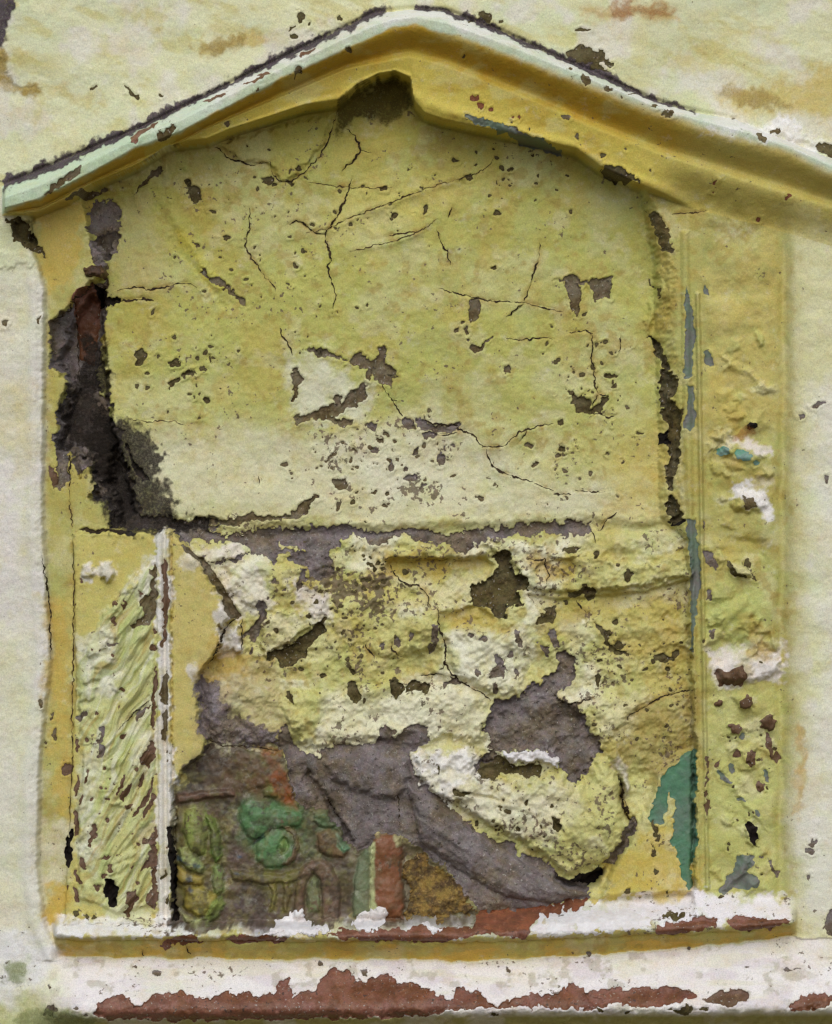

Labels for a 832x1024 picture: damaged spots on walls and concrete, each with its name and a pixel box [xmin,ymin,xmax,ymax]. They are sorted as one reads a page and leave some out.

crack [215,118,613,419]
peeling [37,165,593,704]
crack [382,385,617,543]
spalling [647,335,686,526]
peeling [61,666,170,920]
spalling [193,675,637,944]
spalling [474,584,603,787]
peeling [714,665,753,709]
peeling [703,714,781,821]
peeling [73,960,749,1023]
peeling [655,911,790,935]
peeling [789,992,832,1012]